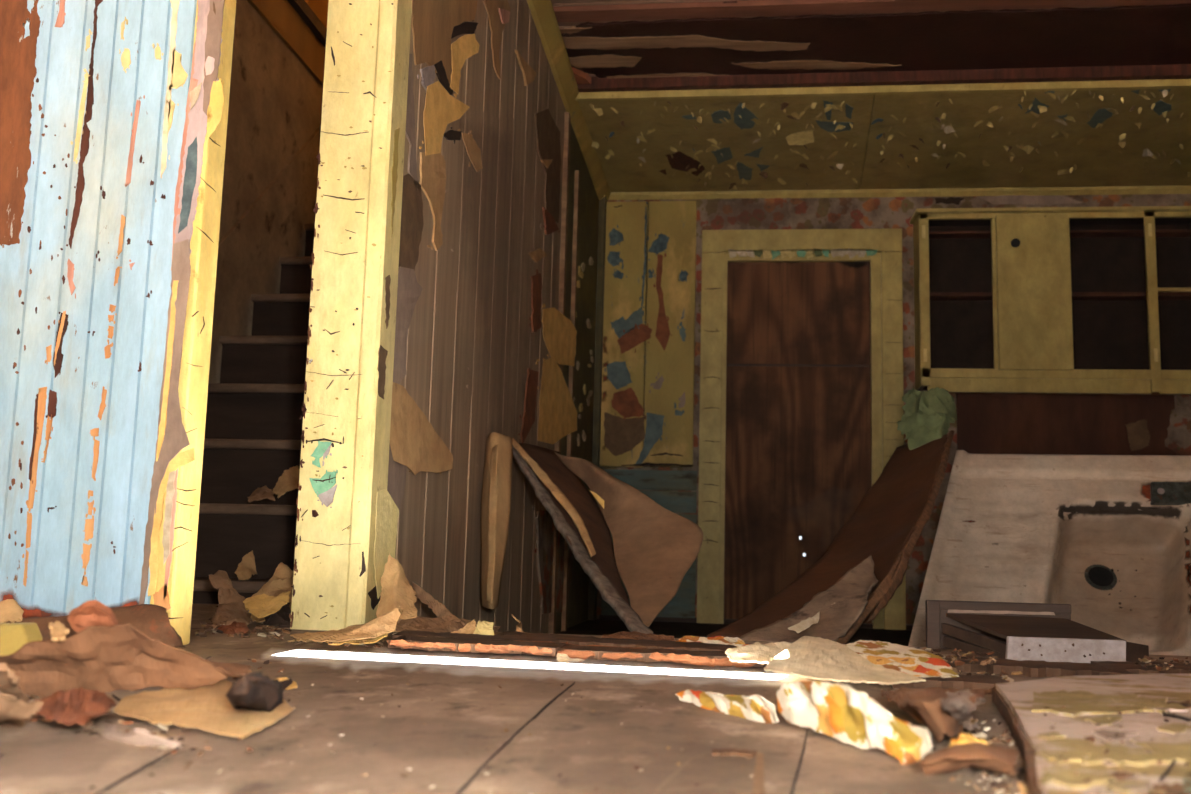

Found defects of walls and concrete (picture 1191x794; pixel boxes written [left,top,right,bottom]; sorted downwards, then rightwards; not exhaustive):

peeling [8,311,68,587]
peeling [0,0,103,299]
peeling [81,386,107,587]
peeling [87,304,117,359]
peeling [114,214,135,286]
peeling [125,95,145,187]
peeling [150,0,188,199]
peeling [291,380,347,596]
peeling [377,345,453,475]
peeling [417,20,483,251]
peeling [520,202,686,464]
peeling [559,4,1191,79]